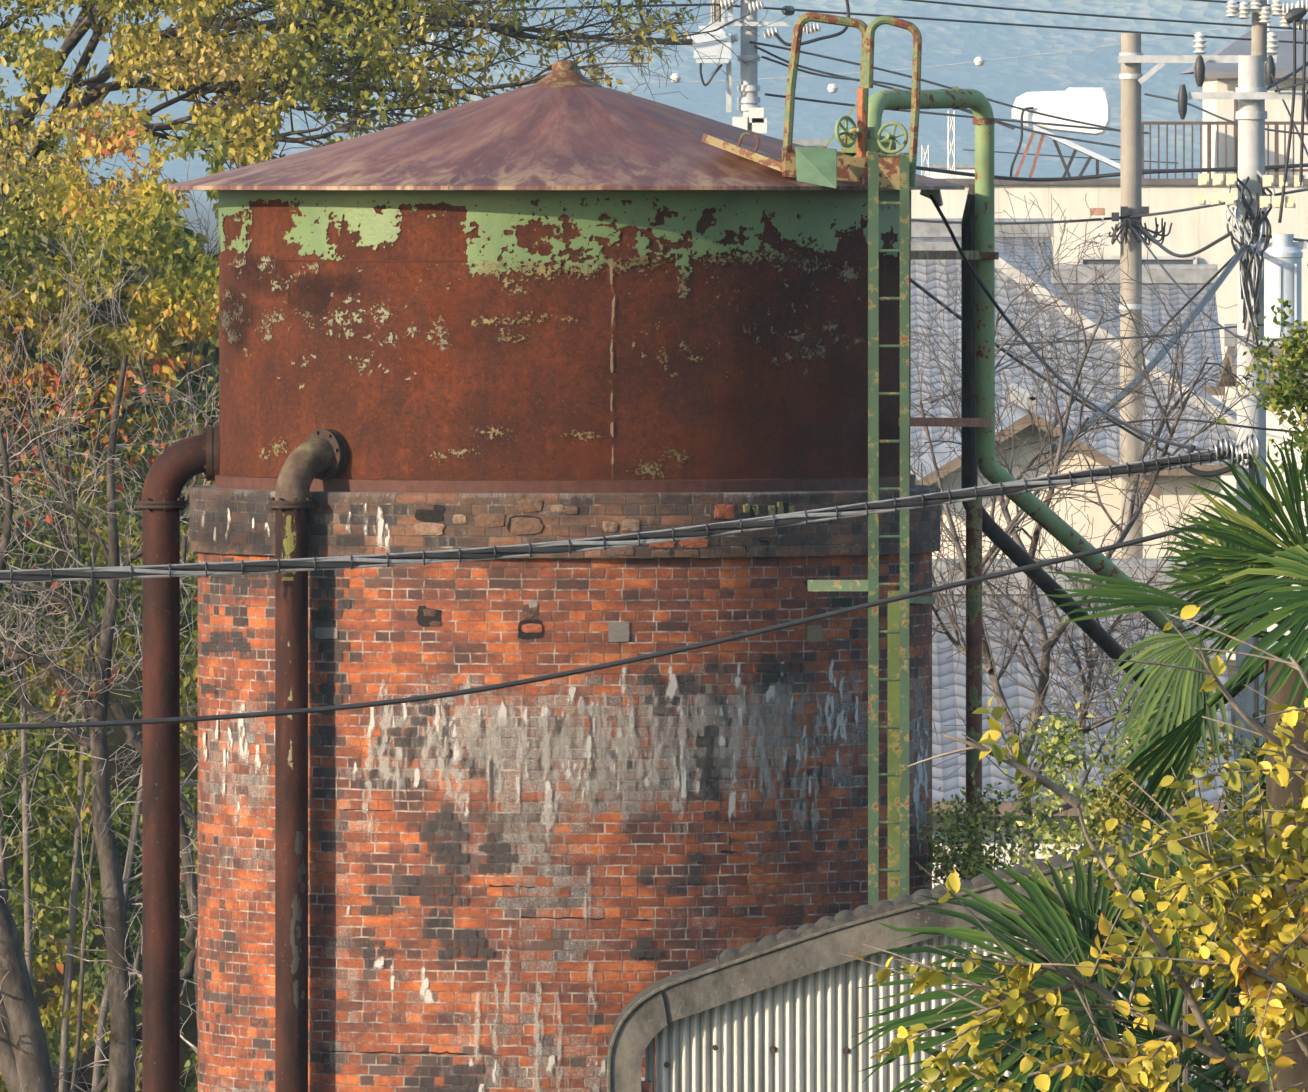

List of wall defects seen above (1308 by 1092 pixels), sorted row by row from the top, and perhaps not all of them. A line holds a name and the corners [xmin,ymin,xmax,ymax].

peeling [218,190,911,378]
damp [353,660,859,893]
corrosion [289,830,308,1021]
damp [375,957,394,990]
damp [420,968,434,1003]
efflorescence [469,928,511,1092]
efflorescence [527,983,561,1092]